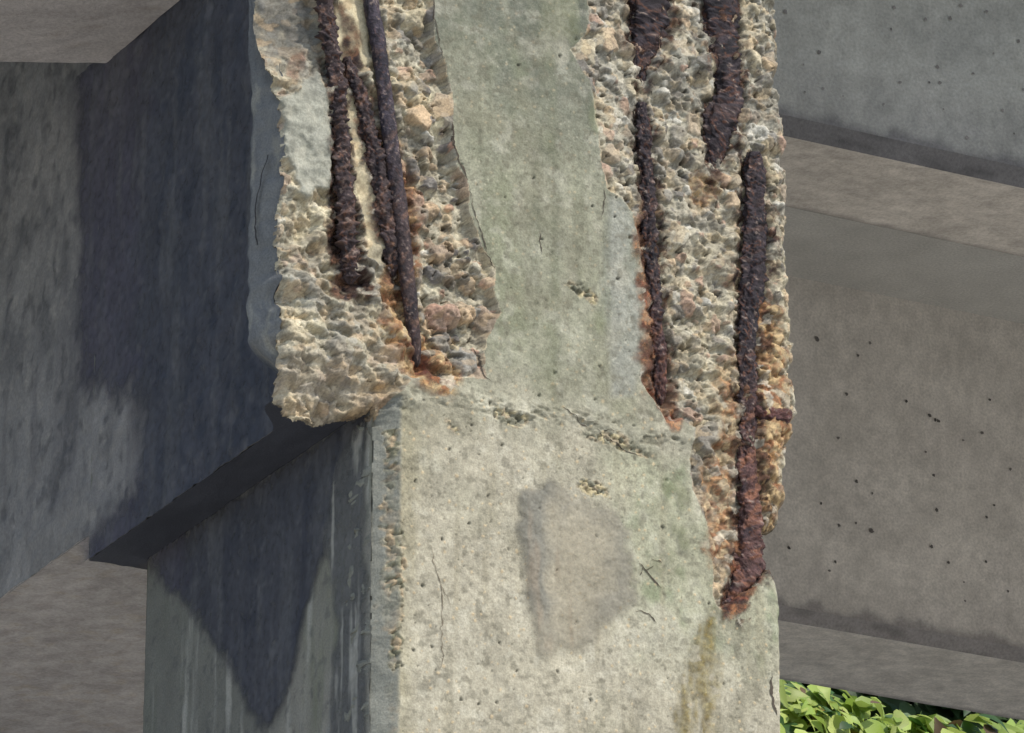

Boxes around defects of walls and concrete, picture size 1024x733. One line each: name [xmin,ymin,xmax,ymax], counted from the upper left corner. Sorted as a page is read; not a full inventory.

crack [254,155,268,245]
spalling [253,0,502,427]
rust [326,0,461,394]
crack [431,546,451,670]
water stain [518,480,637,653]
rust [624,0,687,430]
spalling [570,0,797,612]
rust [676,4,793,733]